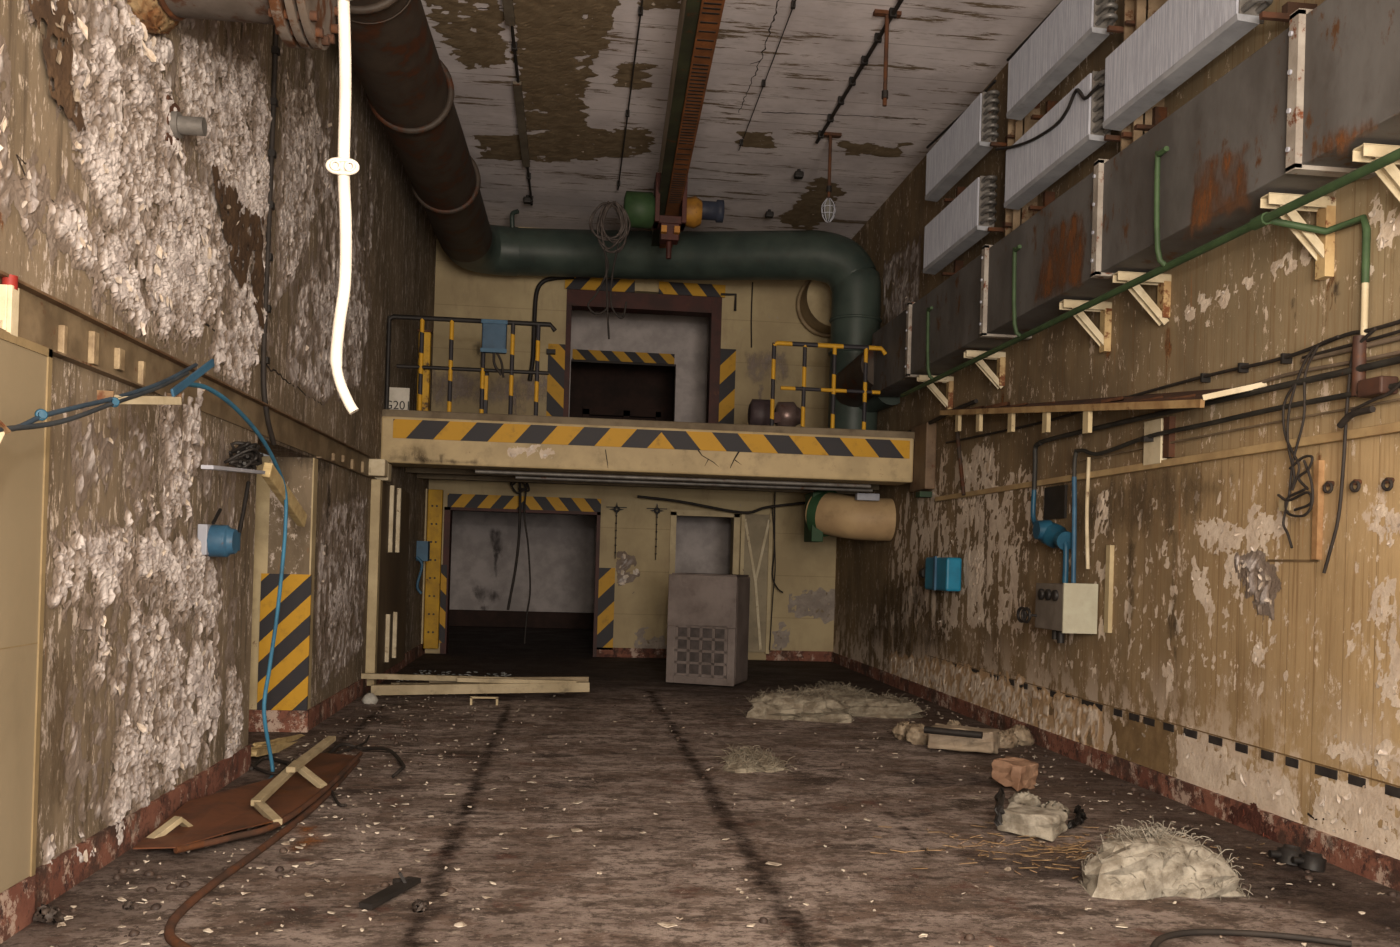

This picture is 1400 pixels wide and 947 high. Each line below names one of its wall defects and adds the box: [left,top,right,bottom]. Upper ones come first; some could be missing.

spalling [423,0,681,163]
spalling [734,131,777,149]
spalling [777,176,847,230]
spalling [836,141,913,157]
corrosion [1190,149,1249,235]
peeling [0,0,376,865]
peeling [867,442,1400,860]